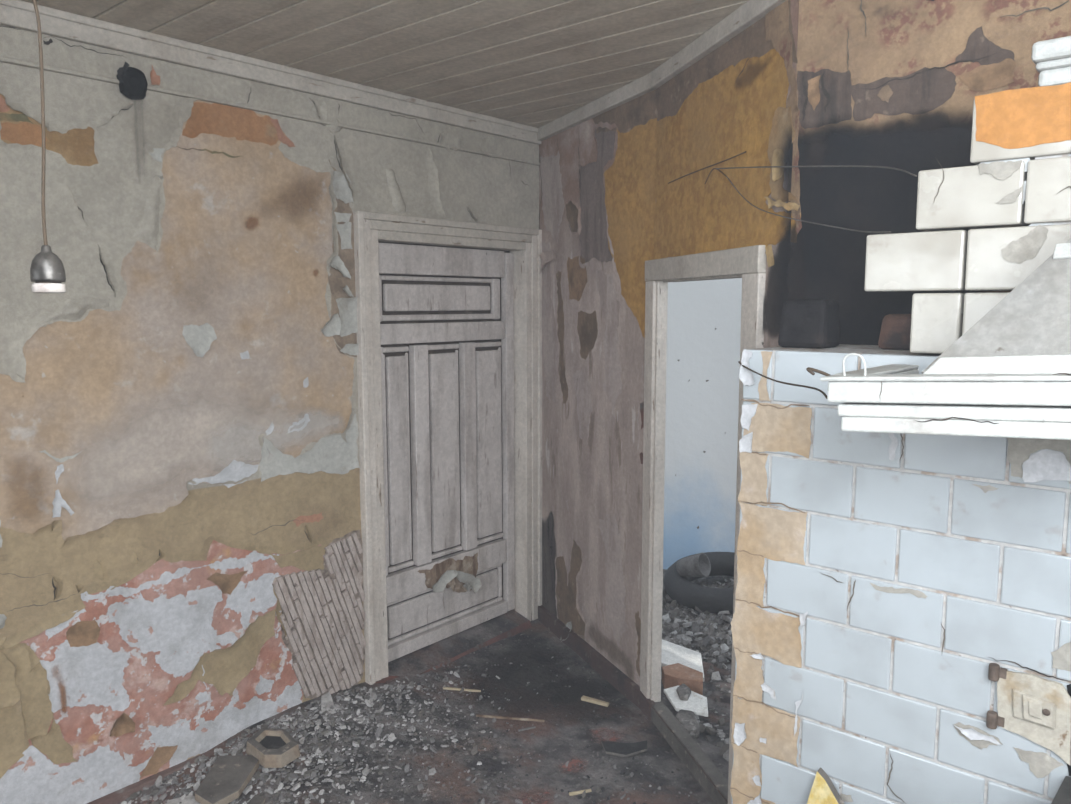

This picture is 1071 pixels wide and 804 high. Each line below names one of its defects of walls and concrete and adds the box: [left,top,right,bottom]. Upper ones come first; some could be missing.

peeling [0,79,106,177]
peeling [765,26,1071,211]
peeling [539,121,618,404]
peeling [765,245,774,267]
peeling [0,97,360,552]
spalling [1007,438,1071,484]
peeling [433,570,482,593]
peeling [555,534,588,642]
peeling [730,349,812,804]
crack [821,573,856,610]
spalling [0,530,401,804]
crack [989,657,1070,682]